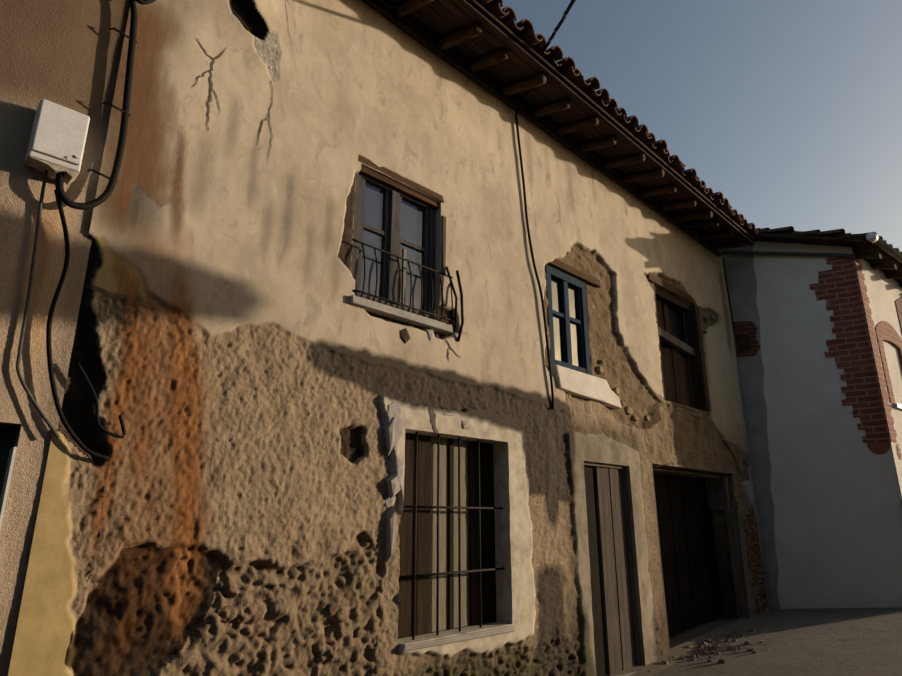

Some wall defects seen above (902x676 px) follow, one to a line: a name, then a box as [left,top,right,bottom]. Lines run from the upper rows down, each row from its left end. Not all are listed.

crack [193,39,226,131]
spalling [230,0,280,80]
crack [257,81,273,163]
flaking render [338,173,357,271]
flaking render [366,307,457,344]
flaking render [429,407,468,434]
flaking render [558,244,769,614]
flaking render [159,402,404,676]